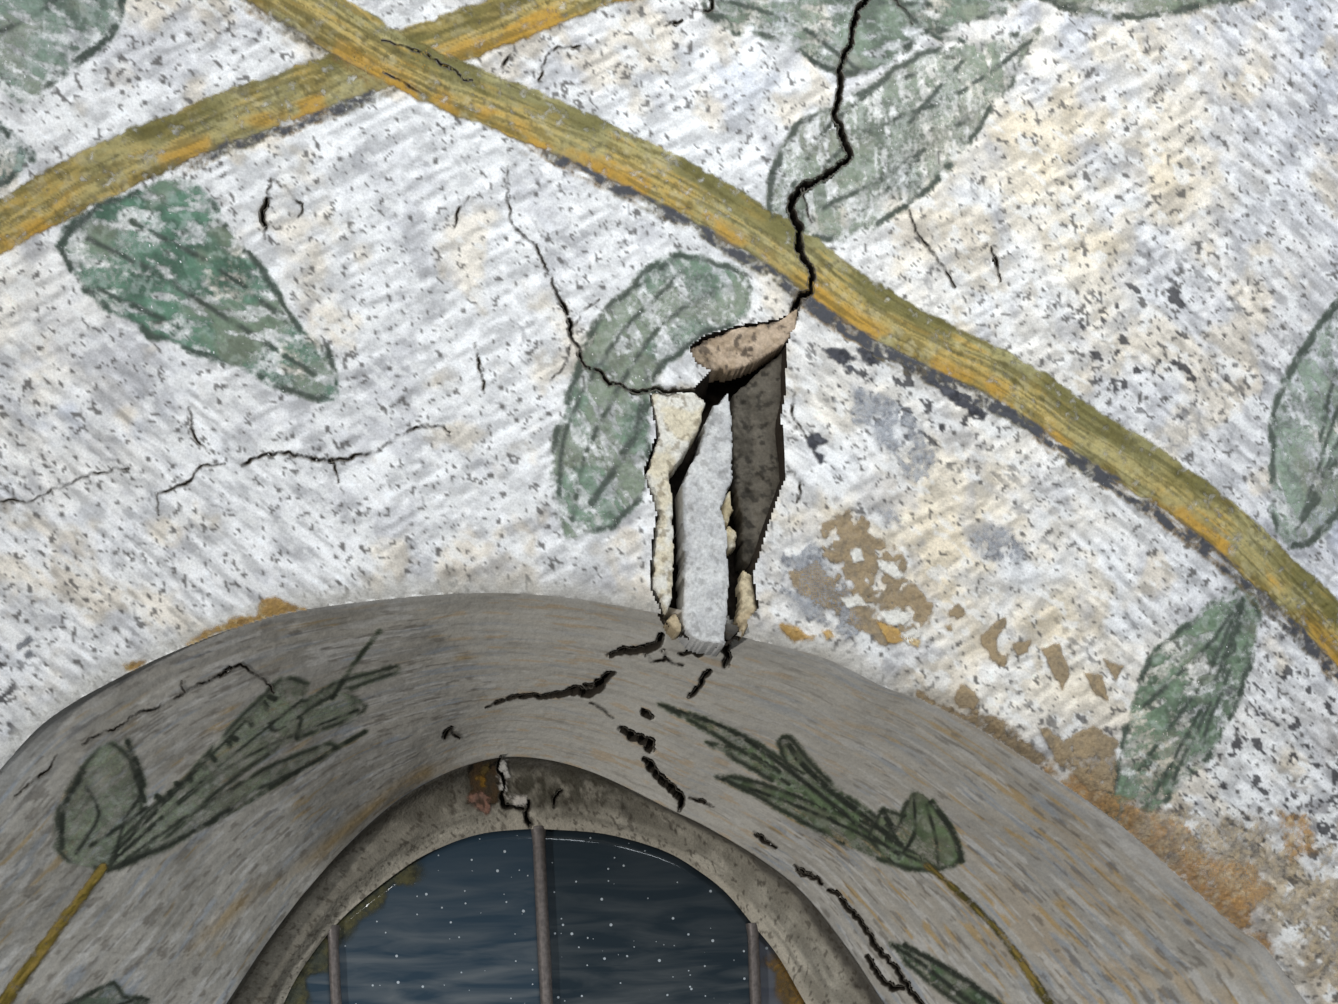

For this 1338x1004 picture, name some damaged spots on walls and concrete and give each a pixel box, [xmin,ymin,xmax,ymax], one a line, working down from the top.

crack [666,0,715,26]
crack [785,0,913,320]
crack [506,170,695,395]
crack [908,209,957,288]
crack [990,246,1002,282]
spalling [644,307,800,657]
crack [484,632,731,813]
peeling [789,510,933,647]
peeling [946,604,966,631]
peeling [981,618,1123,700]
crack [496,755,563,828]
crack [754,832,925,1004]